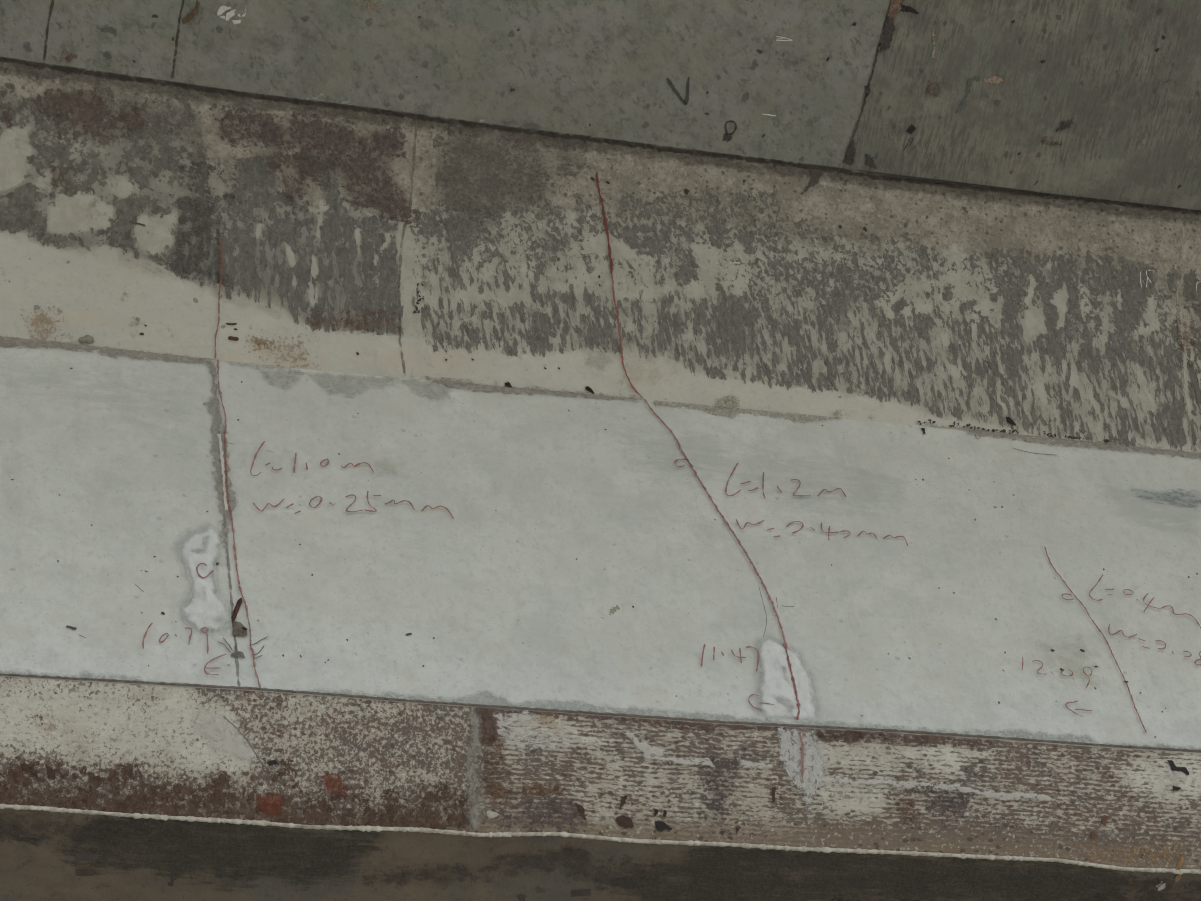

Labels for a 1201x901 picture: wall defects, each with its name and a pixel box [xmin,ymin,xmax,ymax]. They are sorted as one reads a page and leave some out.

water stain [0,67,1201,459]
water stain [0,335,236,630]
crack [215,239,261,688]
crack [596,173,804,777]
water stain [284,640,1201,830]
crack [1044,547,1146,733]